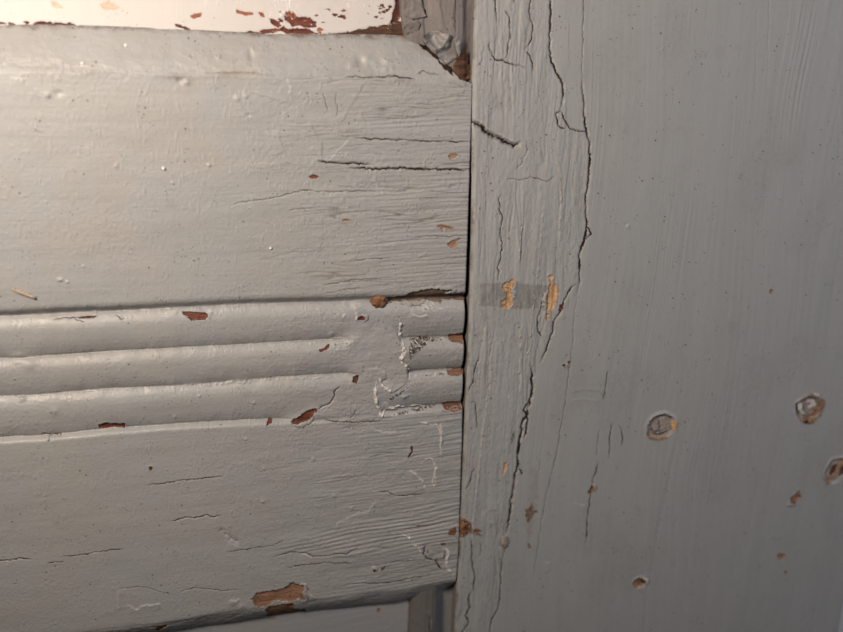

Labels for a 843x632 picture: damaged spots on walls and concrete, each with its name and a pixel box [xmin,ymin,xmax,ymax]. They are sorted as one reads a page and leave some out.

peeling [236,0,471,81]
crack [357,120,556,182]
crack [235,161,466,210]
peeling [182,306,208,321]
peeling [501,279,518,310]
crack [490,0,592,572]
peeling [541,274,564,321]
peeling [448,333,463,344]
peeling [291,409,318,428]
peeling [250,583,309,618]
crack [228,541,441,584]
crack [462,539,481,632]